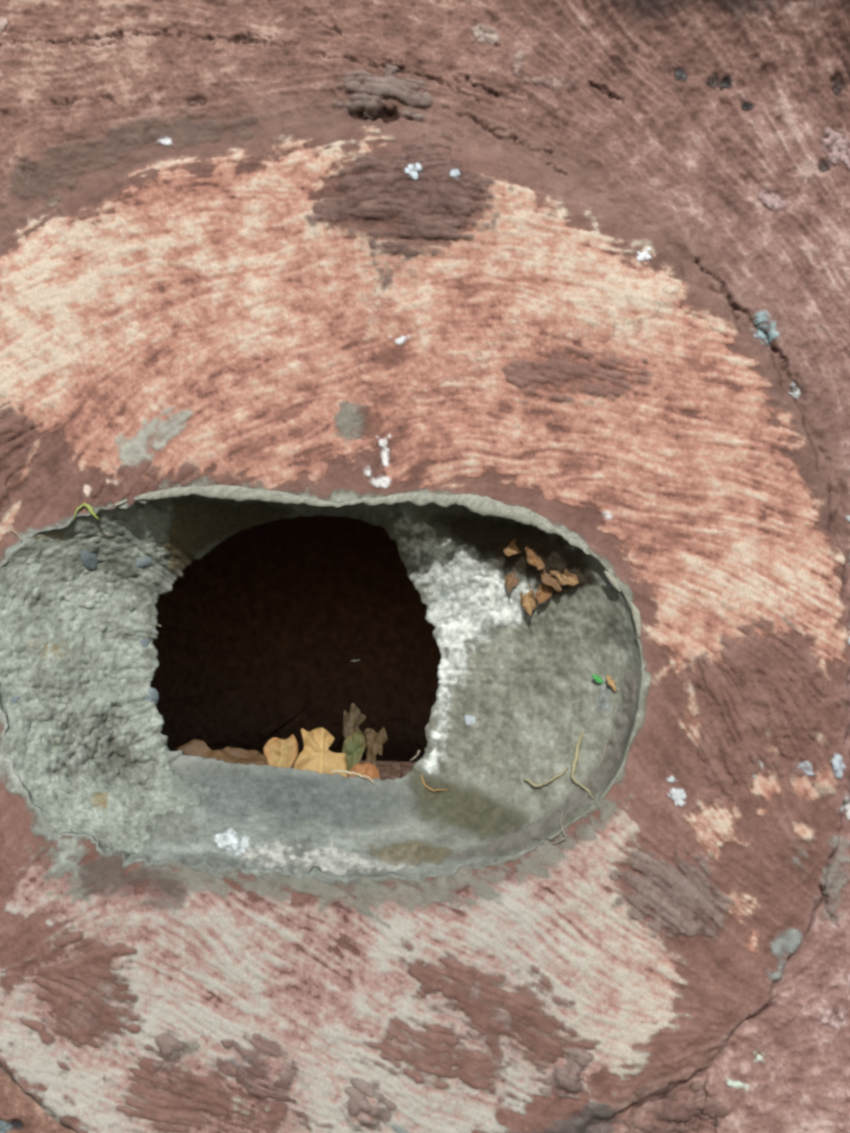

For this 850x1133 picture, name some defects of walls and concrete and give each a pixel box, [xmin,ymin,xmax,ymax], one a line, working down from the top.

crack [209,35,253,44]
peeling [0,126,850,860]